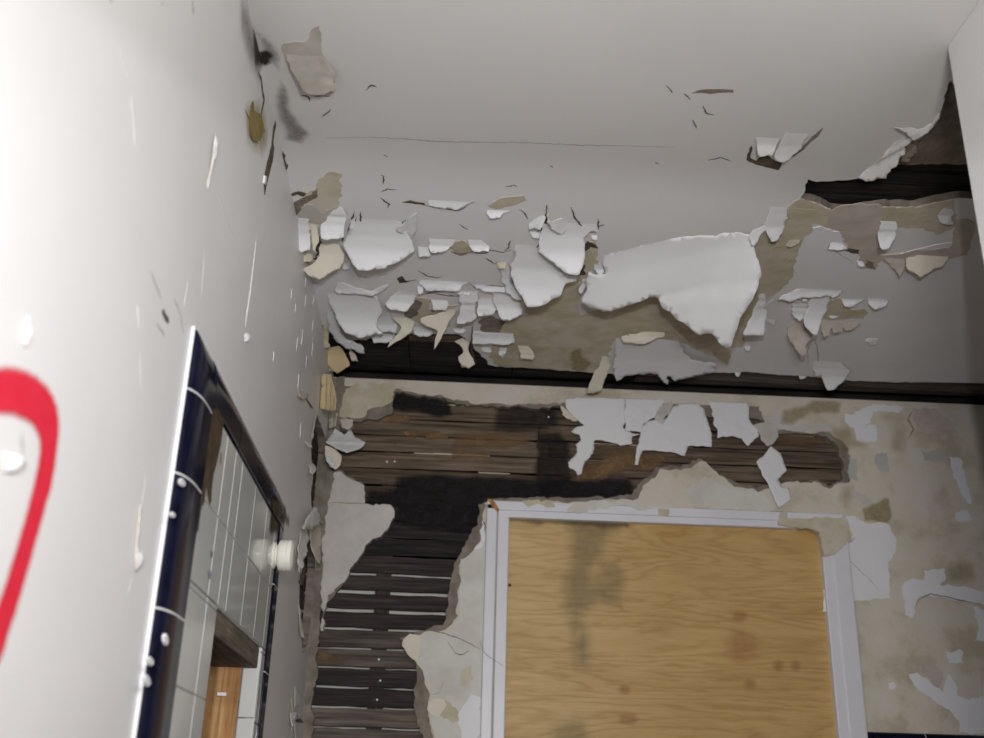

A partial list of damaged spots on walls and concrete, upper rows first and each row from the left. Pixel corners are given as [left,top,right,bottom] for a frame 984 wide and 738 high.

water stain [246,21,272,65]
peeling [271,25,336,102]
peeling [281,96,305,140]
flaking render [901,112,942,164]
water stain [367,393,665,532]
spalling [290,171,984,738]
peeling [128,505,145,593]